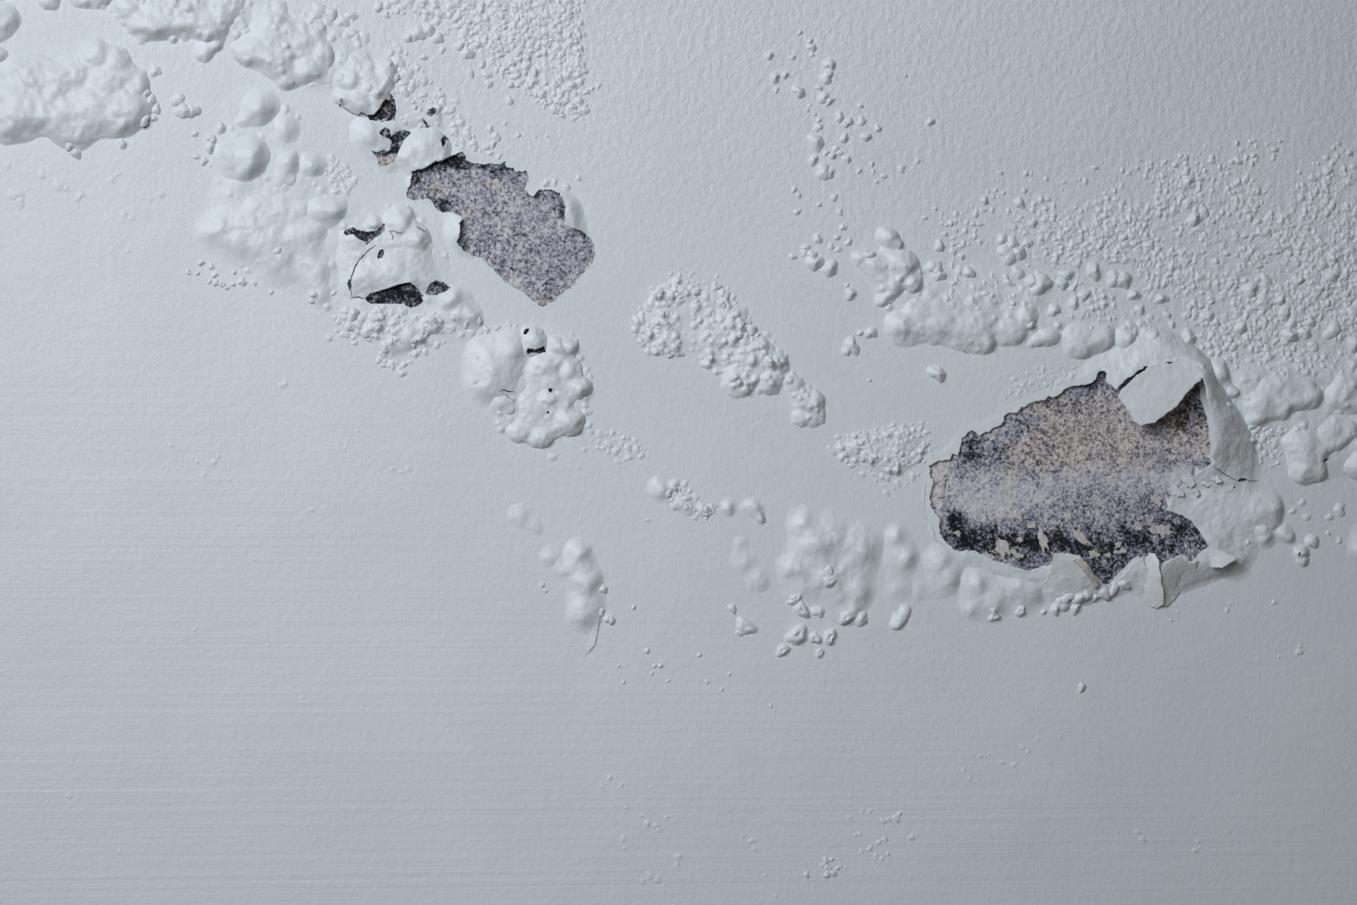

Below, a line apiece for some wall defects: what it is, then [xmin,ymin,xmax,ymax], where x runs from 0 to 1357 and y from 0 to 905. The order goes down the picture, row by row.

peeling [405,146,595,307]
peeling [922,327,1285,609]